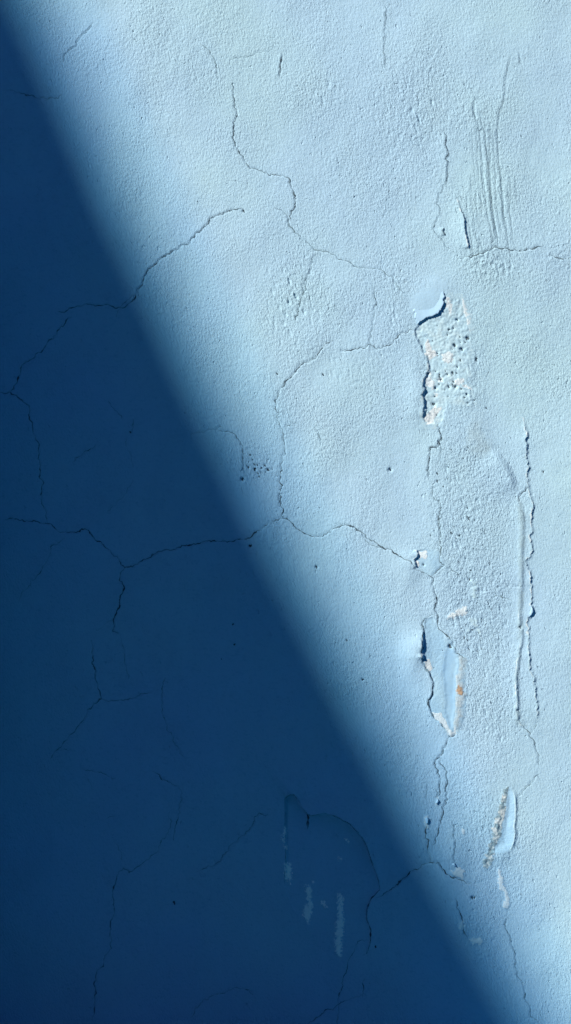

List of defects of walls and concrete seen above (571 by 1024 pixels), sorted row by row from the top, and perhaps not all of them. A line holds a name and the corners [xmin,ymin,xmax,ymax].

crack [465,246,571,259]
spalling [408,275,487,429]
crack [0,47,470,938]
peeling [420,570,481,739]
spalling [481,784,518,910]